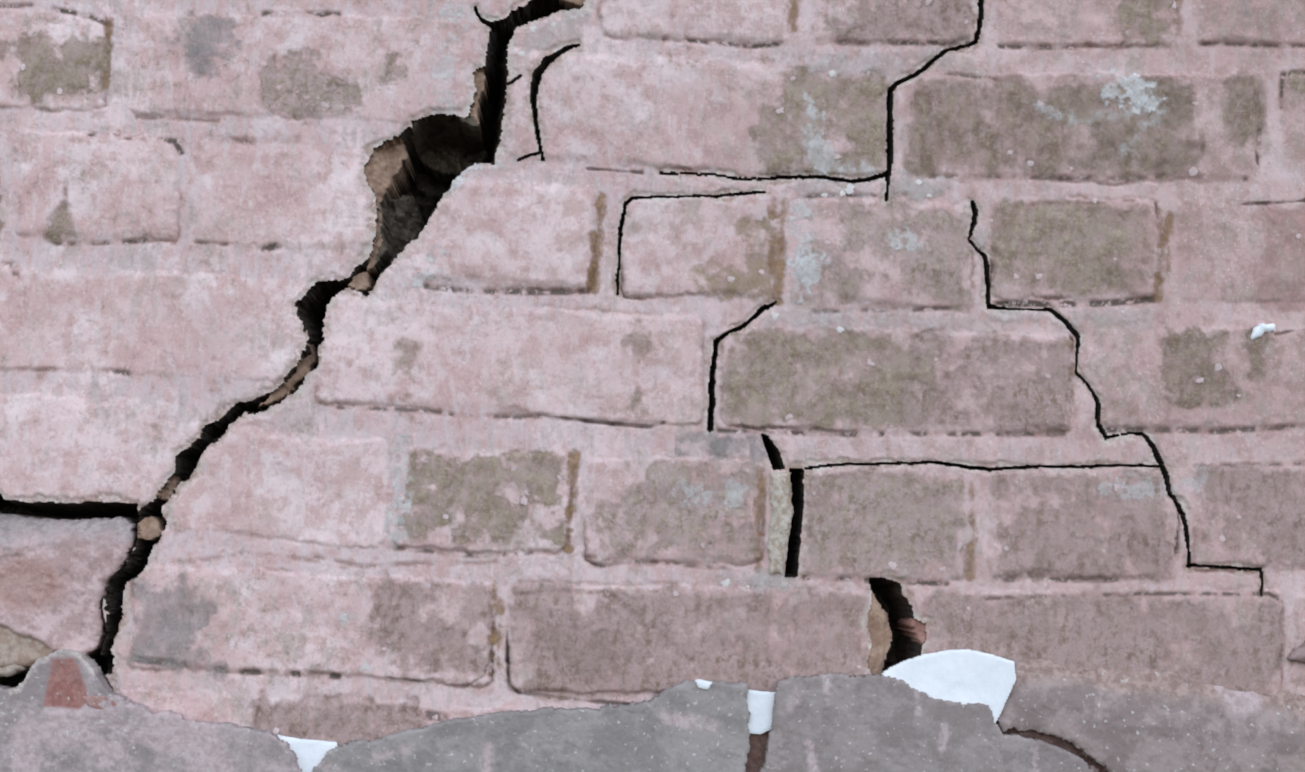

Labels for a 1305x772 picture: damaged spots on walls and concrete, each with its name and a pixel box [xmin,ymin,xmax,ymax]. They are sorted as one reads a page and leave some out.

crack [615,0,984,296]
crack [0,0,585,683]
crack [565,418,663,428]
crack [707,301,777,432]
crack [761,200,1264,597]
crack [0,671,28,687]
spalling [0,664,32,677]
crack [507,643,551,698]